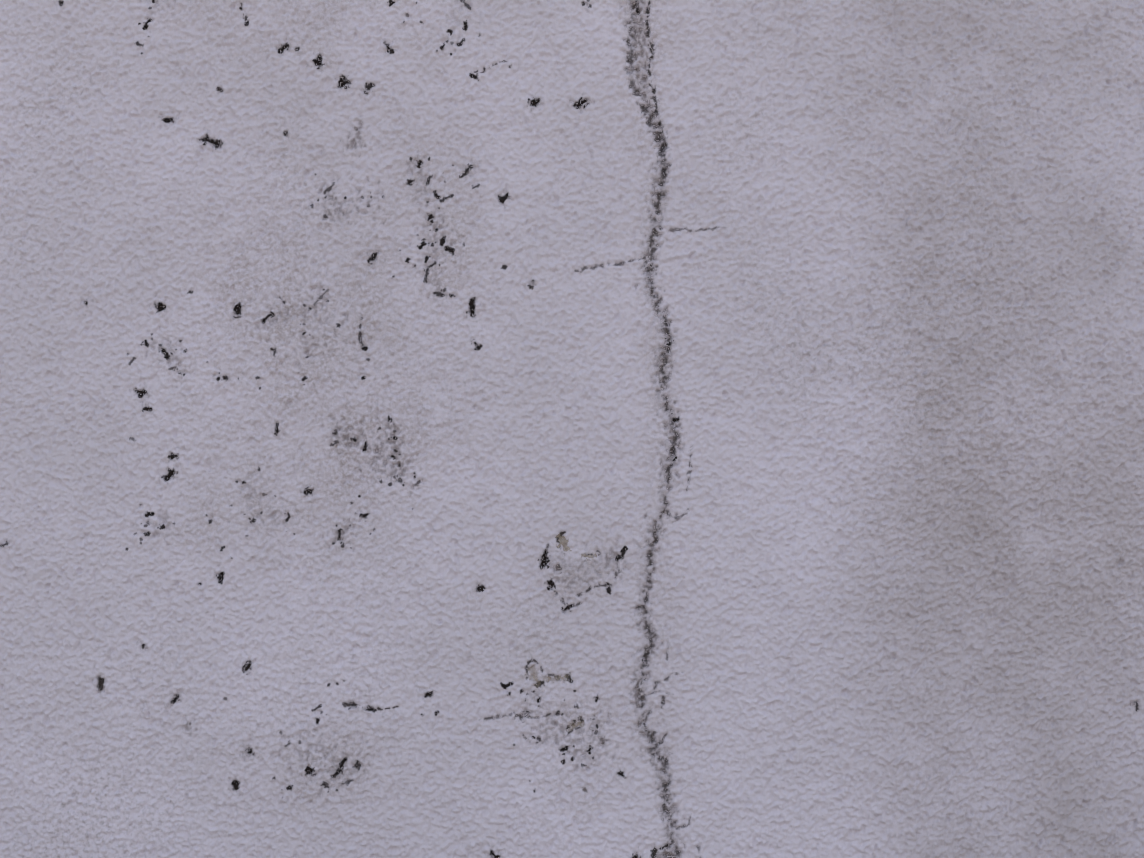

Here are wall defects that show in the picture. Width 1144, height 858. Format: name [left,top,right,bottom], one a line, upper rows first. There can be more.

crack [628,1,661,126]